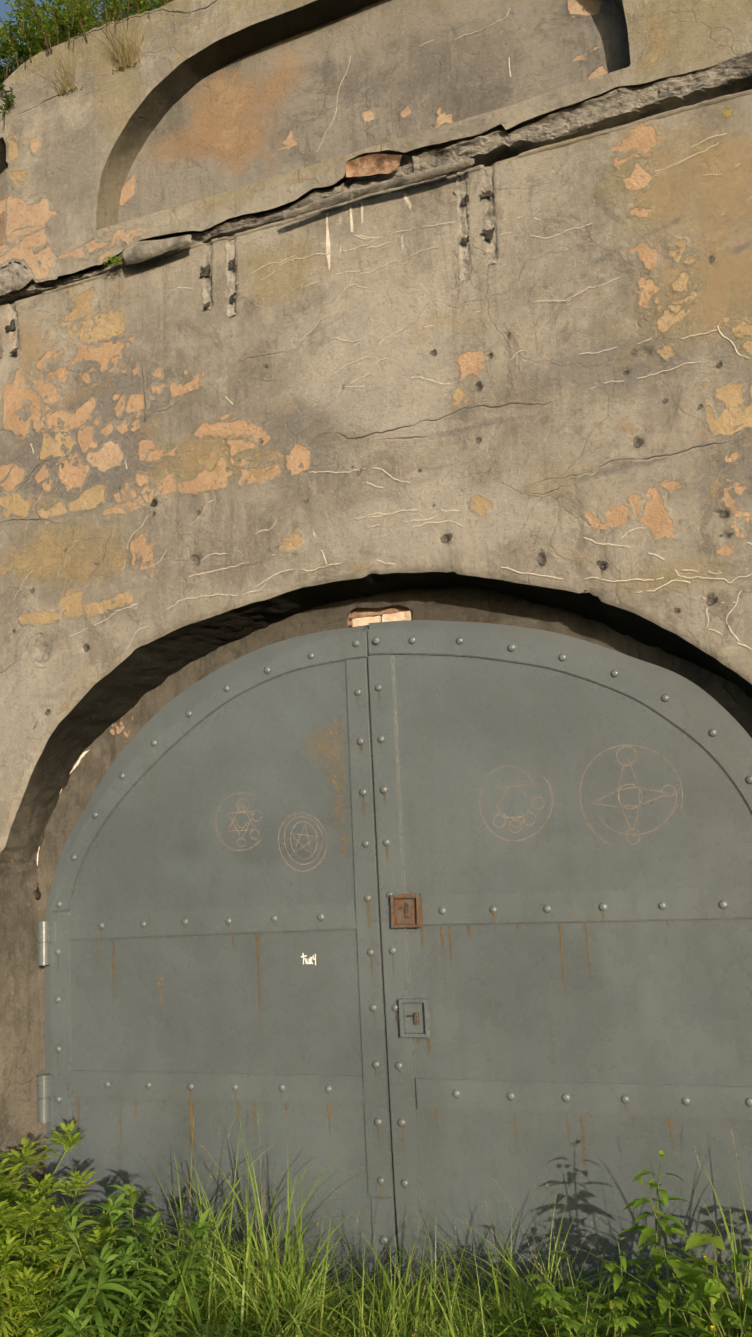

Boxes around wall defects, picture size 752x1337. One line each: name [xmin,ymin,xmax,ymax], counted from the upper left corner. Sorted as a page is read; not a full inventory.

crack [64,0,223,44]
flaking render [565,0,607,28]
spalling [165,51,752,378]
flaking render [0,132,314,663]
crack [308,325,559,529]
flaking render [429,344,495,410]
crack [521,438,744,514]
flaking render [579,466,690,543]
crack [579,325,749,390]
flaking render [695,313,752,565]
crack [69,500,341,651]
crack [501,527,752,652]